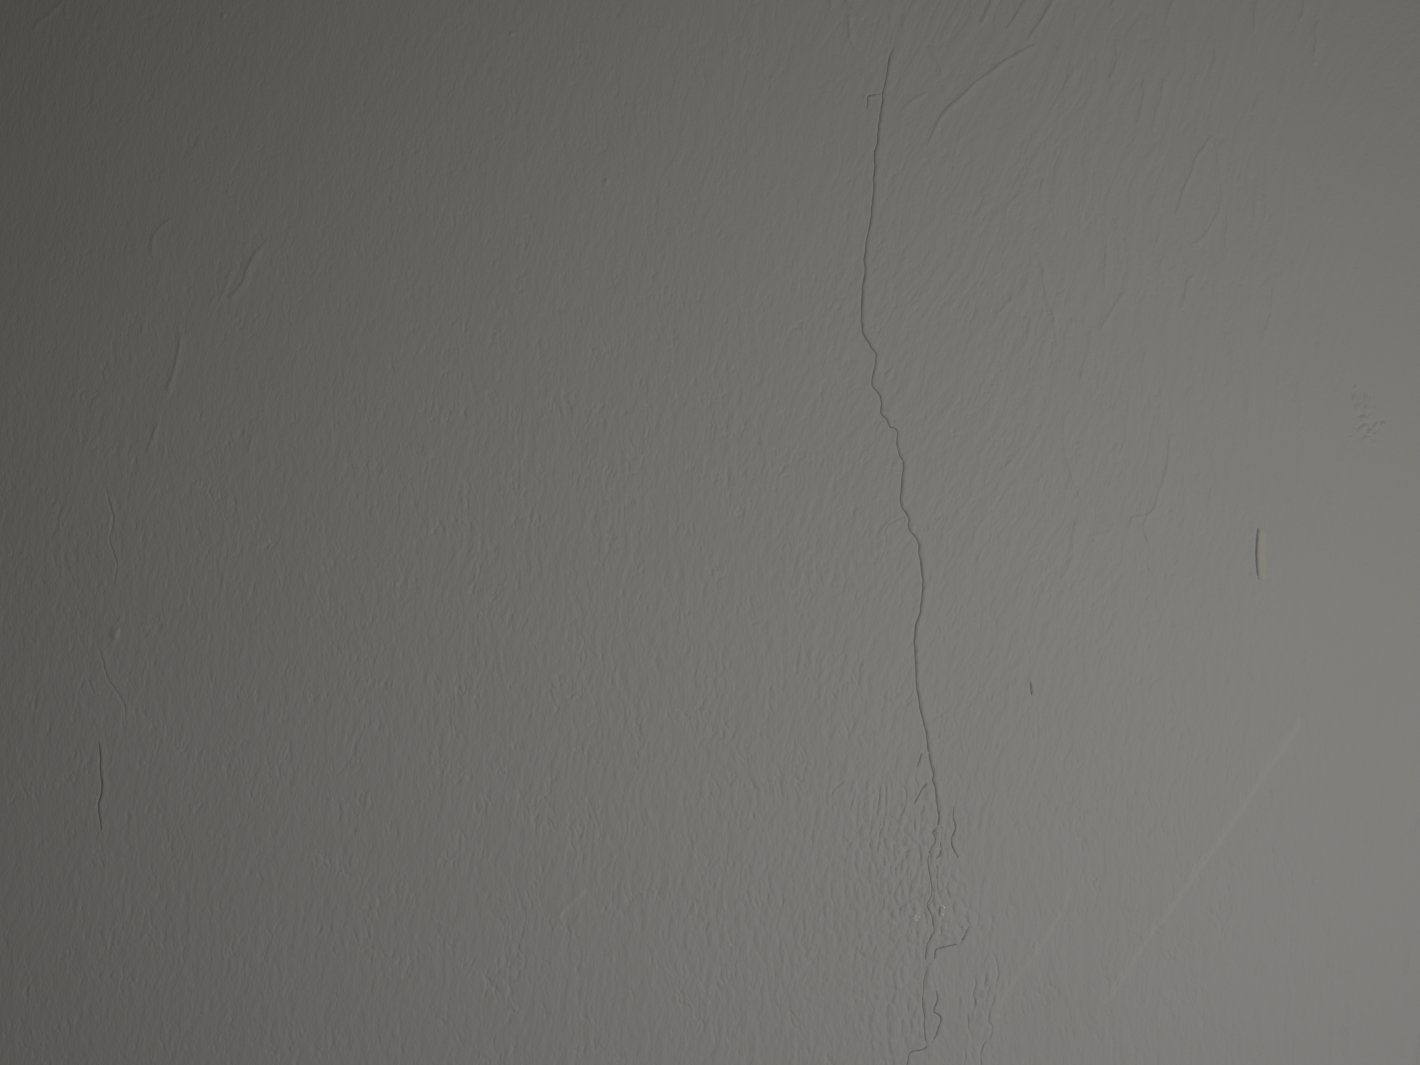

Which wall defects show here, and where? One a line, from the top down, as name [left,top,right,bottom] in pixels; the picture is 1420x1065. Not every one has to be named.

crack [854,47,972,1065]